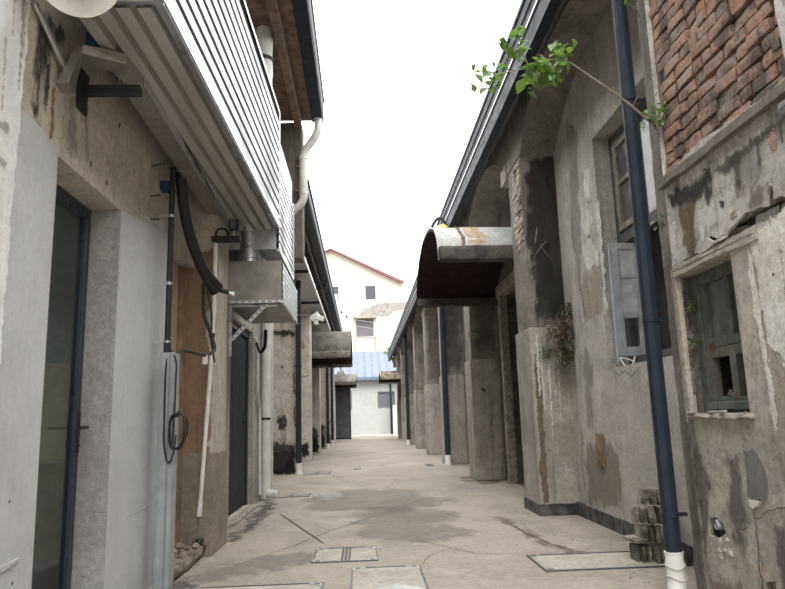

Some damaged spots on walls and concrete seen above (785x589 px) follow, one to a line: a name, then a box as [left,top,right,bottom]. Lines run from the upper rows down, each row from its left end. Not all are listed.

leakage [32,17,65,117]
flaking render [648,0,785,174]
spalling [714,191,785,245]
leakage [534,334,563,504]
crack [730,507,785,589]